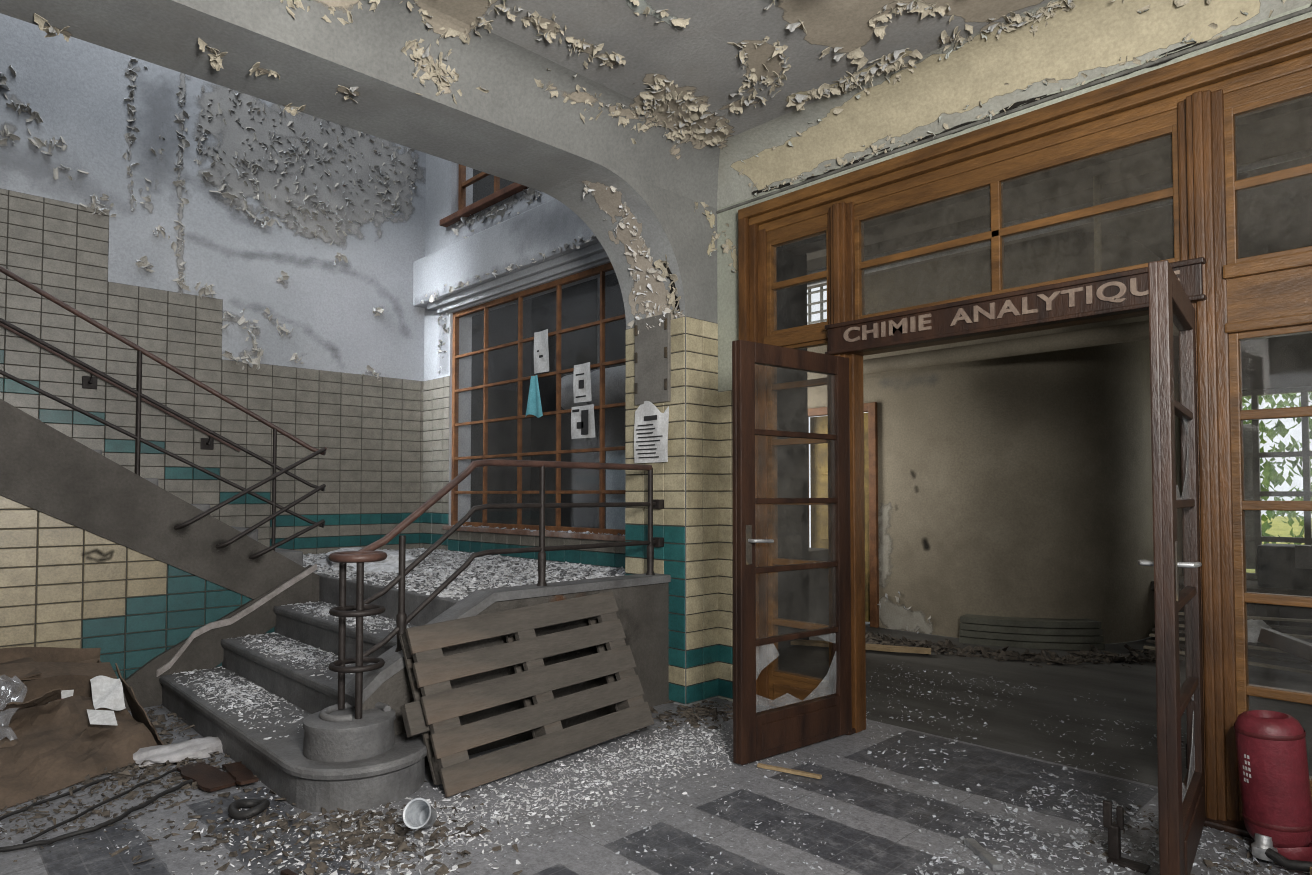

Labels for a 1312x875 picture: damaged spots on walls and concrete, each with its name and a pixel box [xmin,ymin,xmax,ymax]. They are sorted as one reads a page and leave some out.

peeling [0,65,89,180]
peeling [79,38,425,297]
peeling [280,0,380,25]
peeling [399,0,1286,197]
peeling [222,308,294,370]
peeling [421,180,685,374]